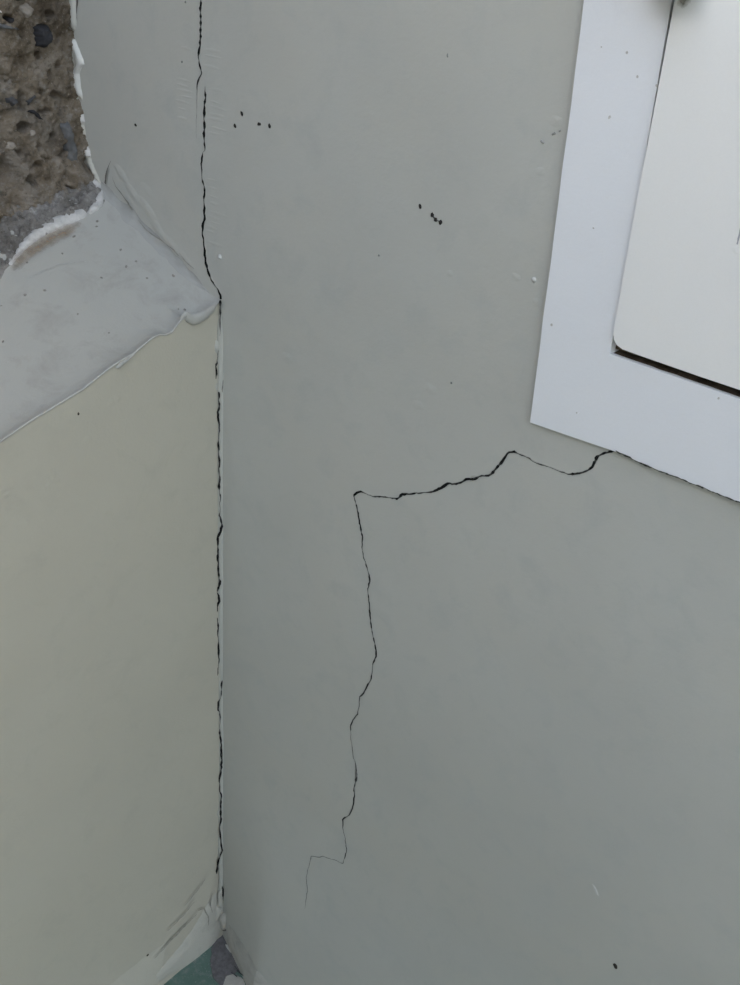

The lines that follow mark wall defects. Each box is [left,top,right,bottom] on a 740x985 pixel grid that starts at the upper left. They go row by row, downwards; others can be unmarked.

spalling [0,0,105,279]
crack [196,0,224,897]
crack [305,448,740,906]